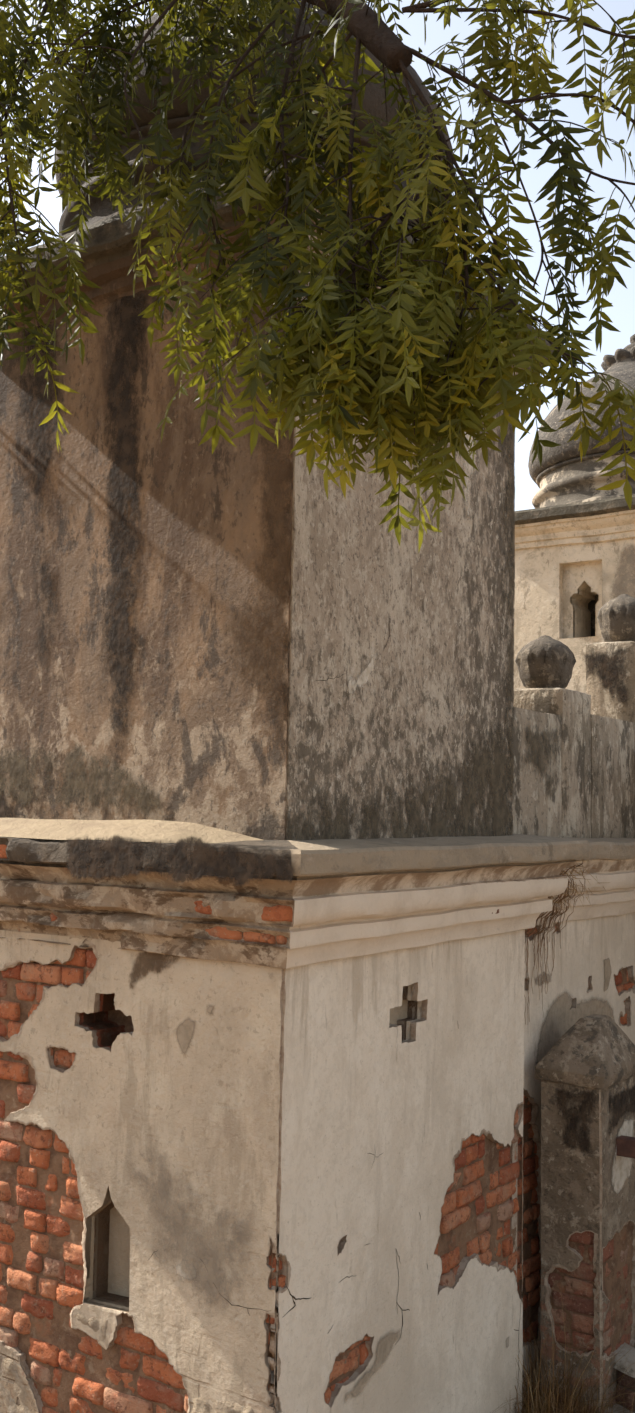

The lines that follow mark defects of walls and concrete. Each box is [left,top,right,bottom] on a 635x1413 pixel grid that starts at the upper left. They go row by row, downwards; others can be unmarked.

leakage [0,291,159,814]
leakage [232,408,293,743]
leakage [288,414,515,840]
leakage [613,547,635,598]
peeling [176,1019,195,1053]
flaking render [194,900,293,944]
flaking render [570,958,635,1027]
flaking render [0,943,190,1413]
flaking render [434,1088,635,1361]
flaking render [263,1234,291,1413]
flaking render [324,1331,400,1408]